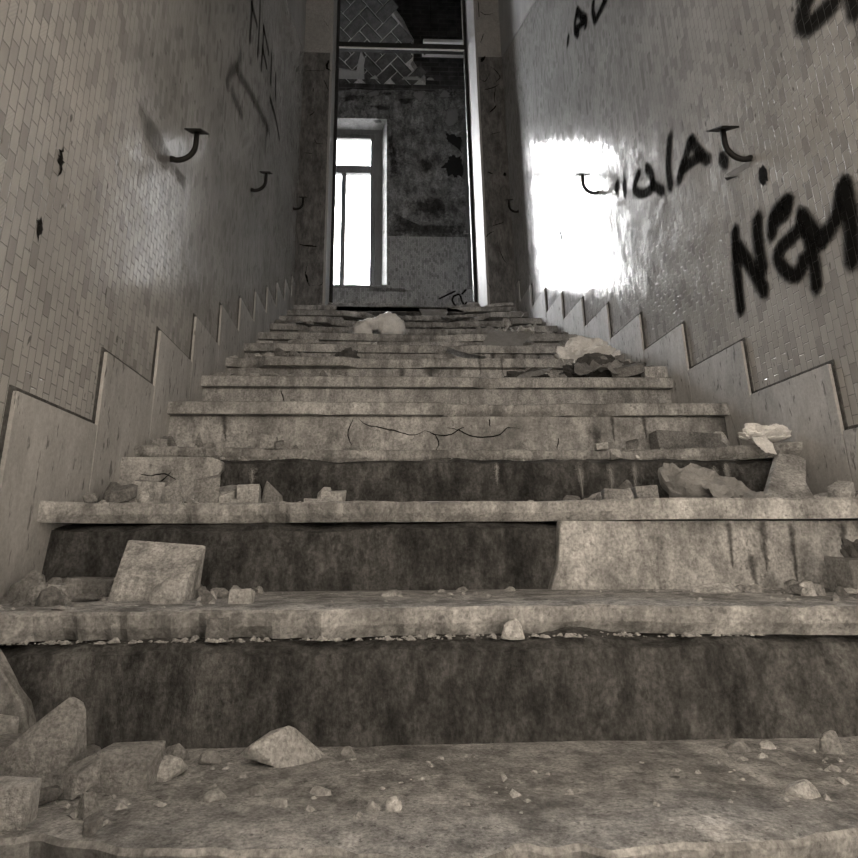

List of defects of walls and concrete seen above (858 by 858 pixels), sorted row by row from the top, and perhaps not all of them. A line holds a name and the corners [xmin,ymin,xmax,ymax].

crack [347,419,519,450]
flaking render [780,779,821,799]
flaking render [366,796,402,812]